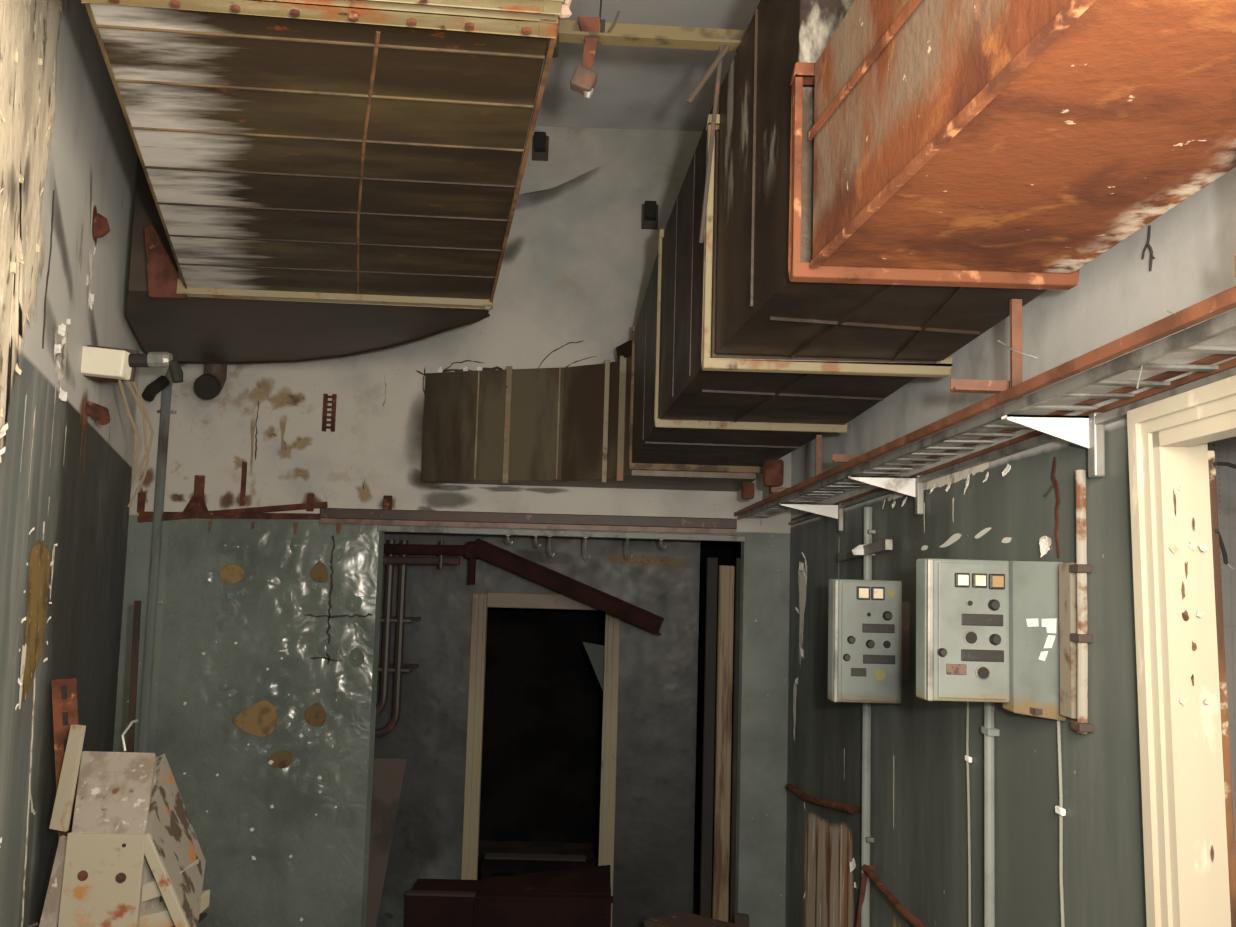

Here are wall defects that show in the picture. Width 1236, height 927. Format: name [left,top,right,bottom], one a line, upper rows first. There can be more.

peeling [0,0,62,463]
damp [252,382,303,407]
damp [236,422,310,467]
damp [140,470,153,502]
damp [221,493,233,507]
damp [359,484,370,500]